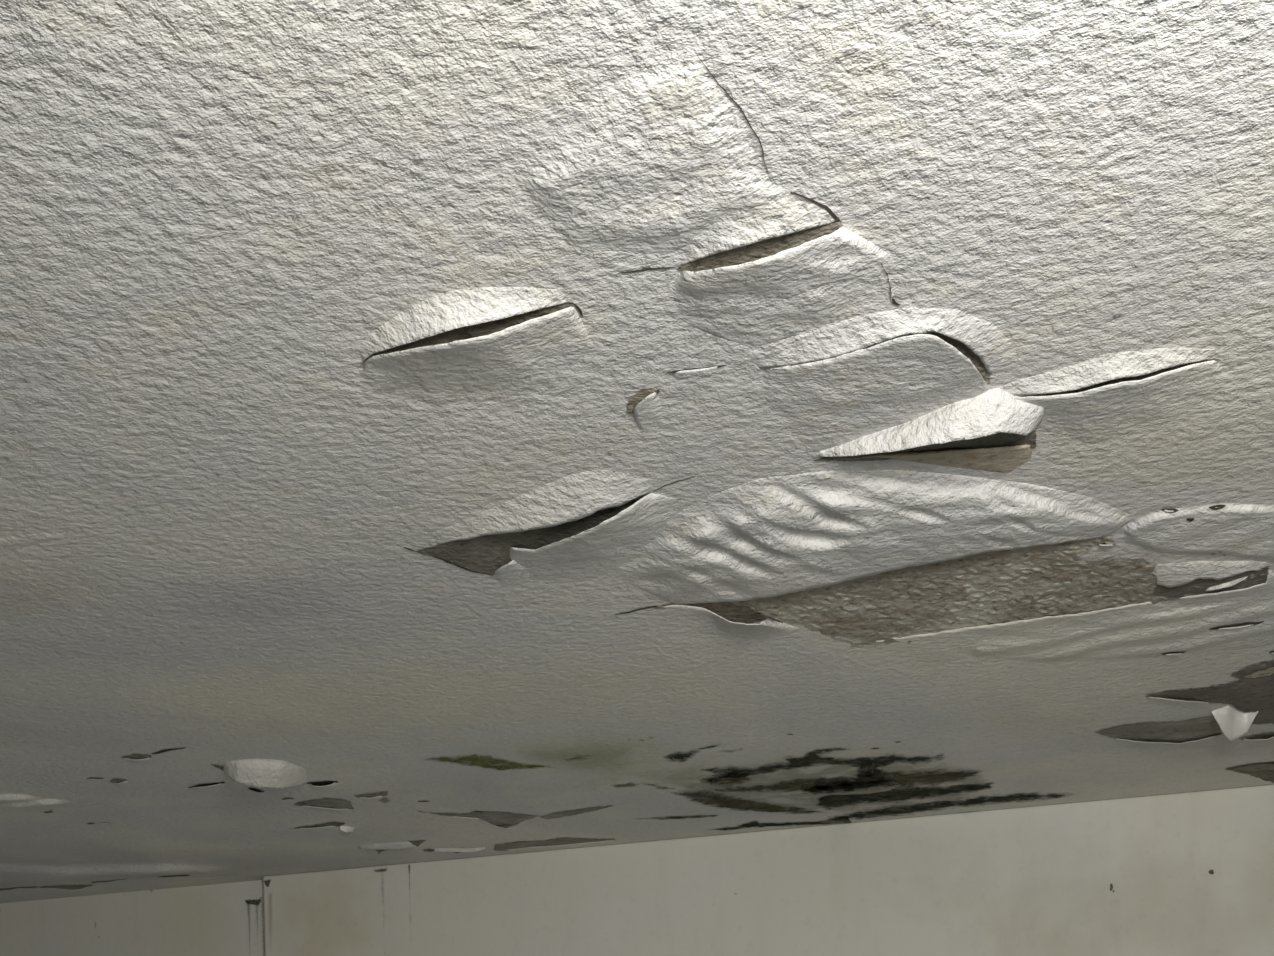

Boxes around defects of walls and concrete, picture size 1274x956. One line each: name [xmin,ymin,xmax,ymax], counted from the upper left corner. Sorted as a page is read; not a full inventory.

crack [698,57,768,172]
crack [359,287,593,405]
crack [617,192,1228,450]
peeling [405,388,1274,663]
peeling [1095,661,1274,751]
peeling [358,806,616,854]
leakage [616,741,1065,830]
peeling [1226,763,1274,783]